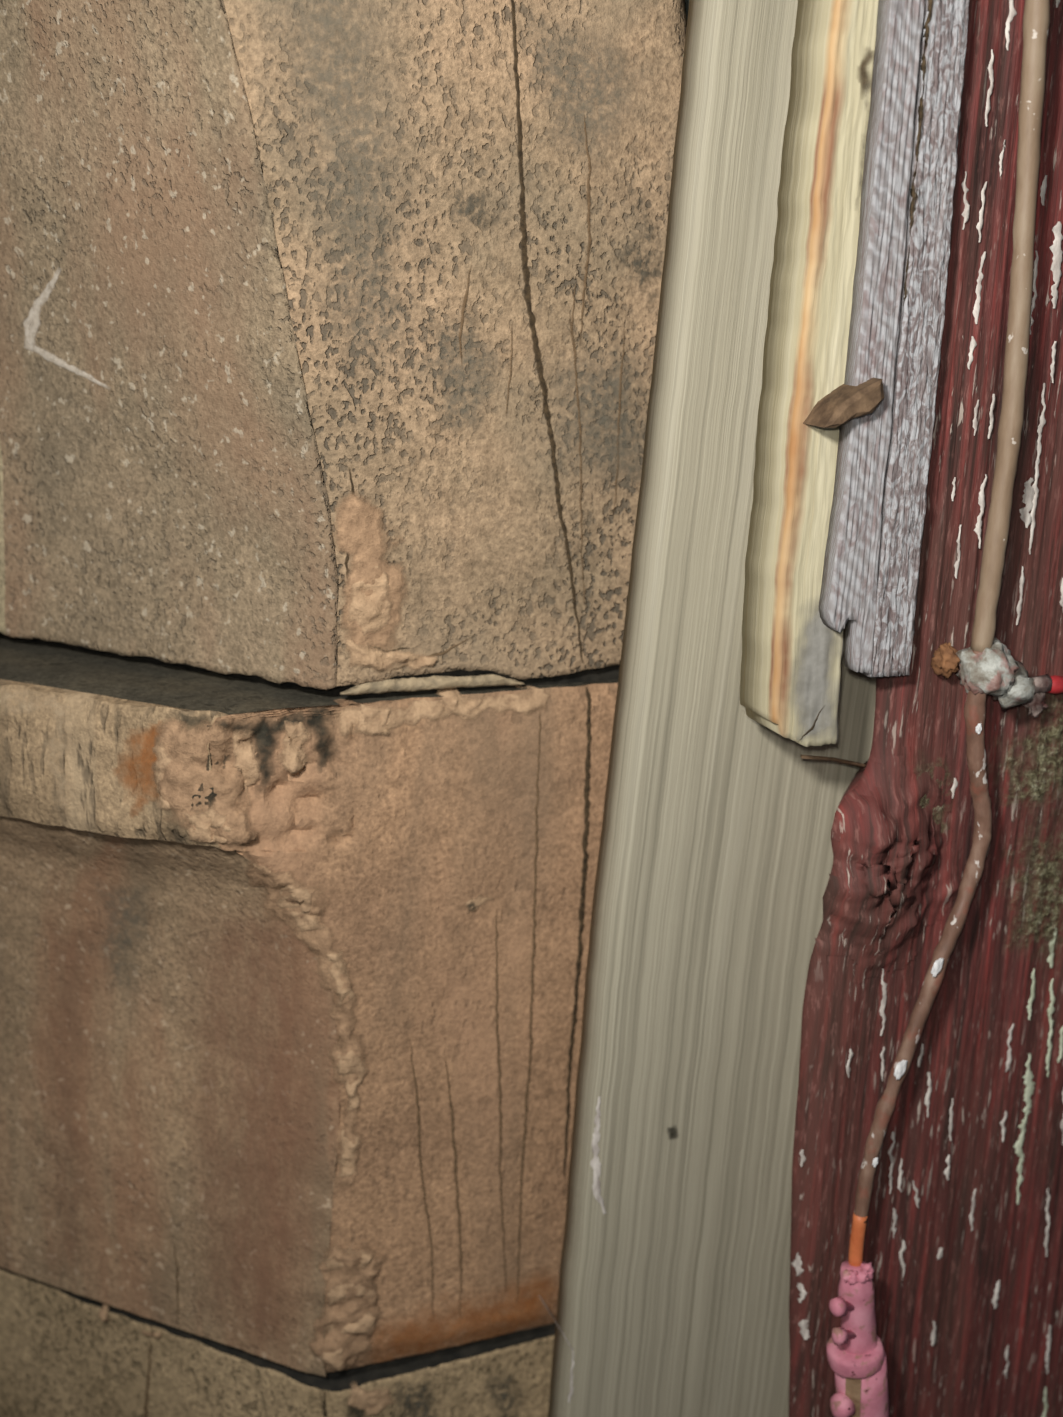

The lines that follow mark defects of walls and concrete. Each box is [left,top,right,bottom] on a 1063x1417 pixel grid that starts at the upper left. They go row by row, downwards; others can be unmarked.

peeling [985,0,1017,126]
crack [459,269,471,362]
peeling [961,139,1006,369]
peeling [1030,221,1063,335]
crack [506,0,625,1175]
peeling [954,474,987,578]
peeling [1016,341,1057,625]
spalling [153,720,368,1186]
crack [410,1044,462,1316]
crack [495,715,541,1301]
peeling [1000,927,1063,1205]
damp [349,1406,365,1417]